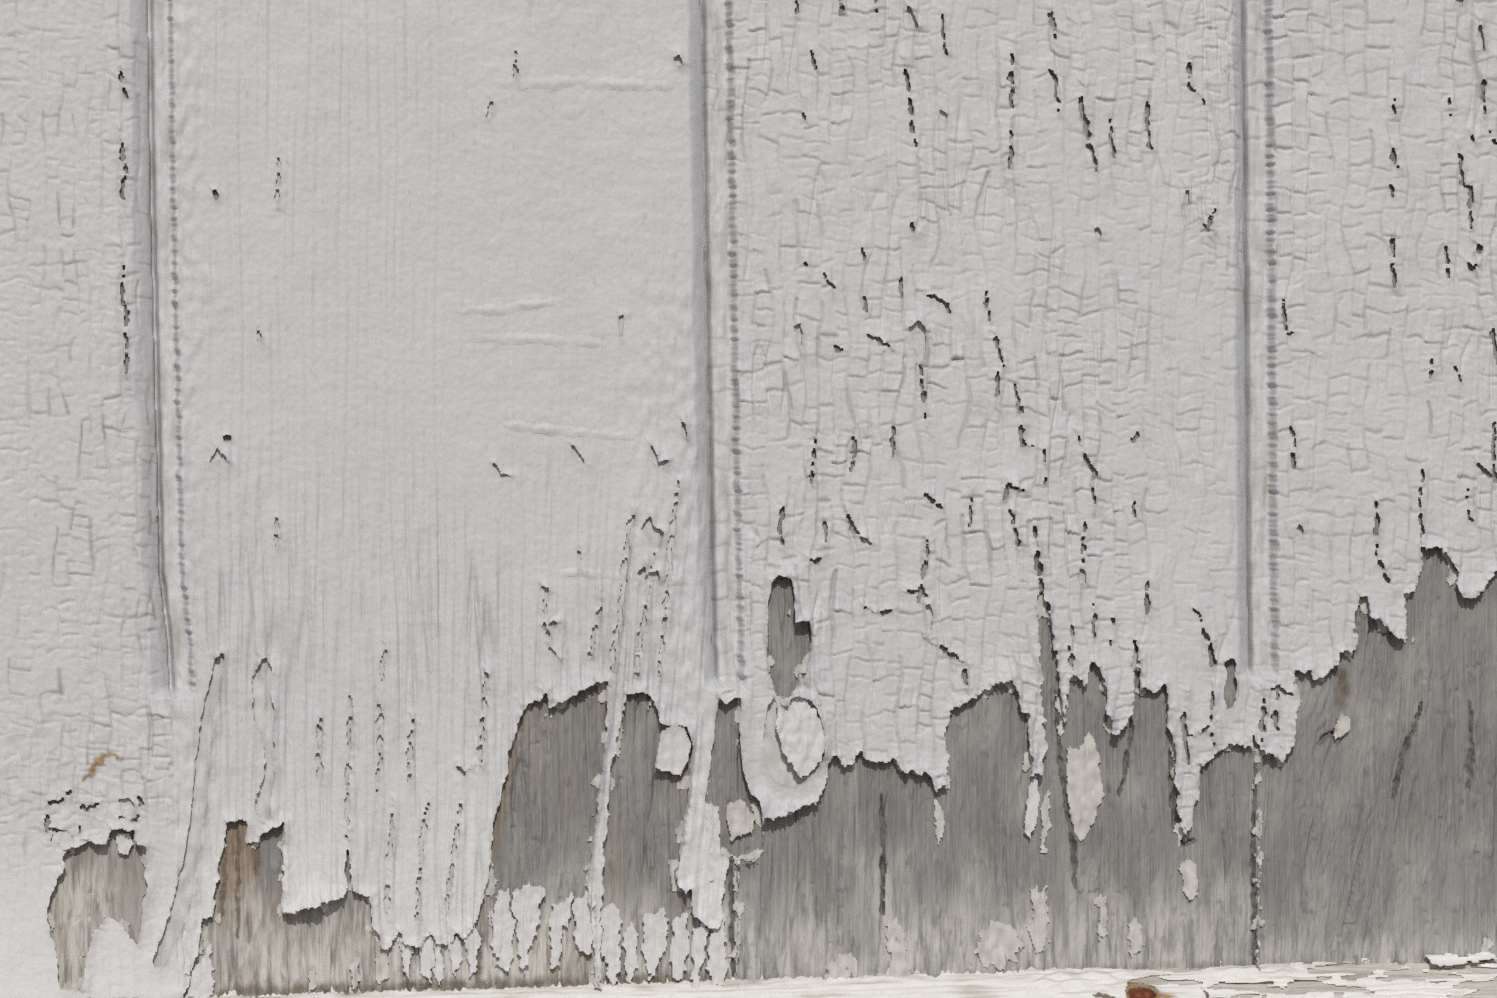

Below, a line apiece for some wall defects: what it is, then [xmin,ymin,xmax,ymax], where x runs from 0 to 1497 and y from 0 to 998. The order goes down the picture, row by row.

crack [903,69,918,147]
crack [1006,11,1153,172]
crack [1444,79,1497,278]
crack [120,265,130,374]
peeling [641,517,664,548]
crack [777,247,1151,889]
crack [1373,501,1390,583]
crack [1417,469,1425,538]
crack [1465,421,1497,522]
crack [44,789,145,833]
peeling [153,546,1497,998]
peeling [47,798,148,990]